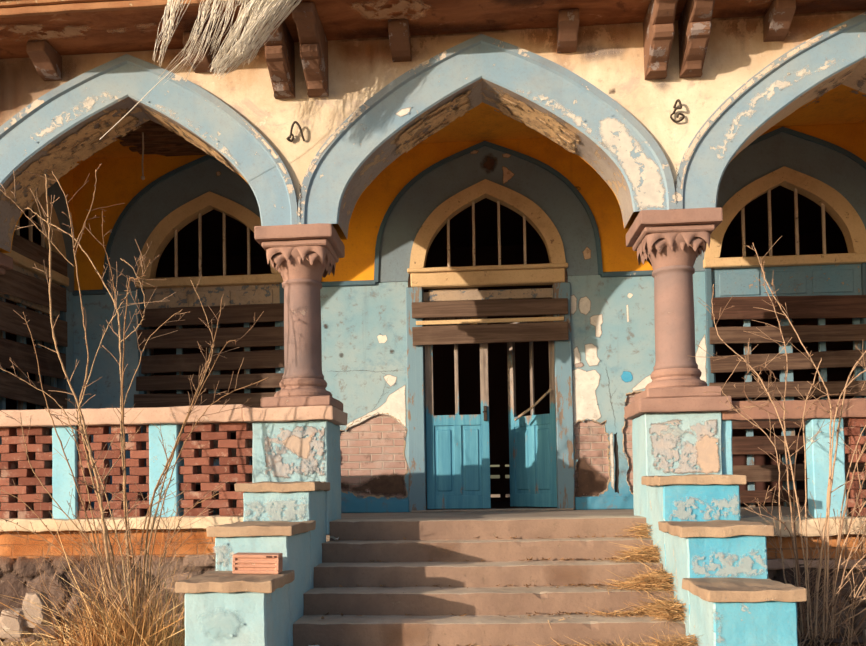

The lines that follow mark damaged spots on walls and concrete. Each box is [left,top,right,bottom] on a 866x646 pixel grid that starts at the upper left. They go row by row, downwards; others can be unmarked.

flaking render [0,93,239,214]
flaking render [395,89,472,155]
peeling [494,90,665,209]
peeling [681,24,846,189]
flaking render [571,295,652,497]
peeling [264,425,325,478]
flaking render [340,374,409,500]
peeling [648,419,720,474]
peeling [244,498,308,521]
peeling [670,495,741,520]
peeling [692,549,768,577]